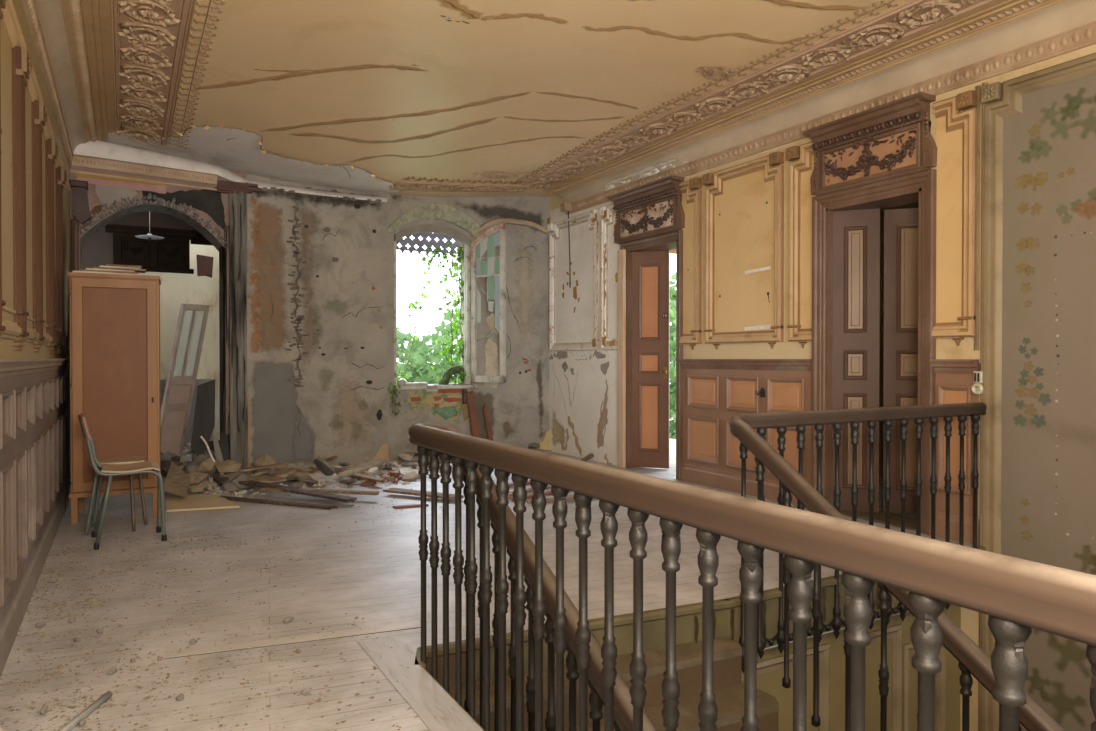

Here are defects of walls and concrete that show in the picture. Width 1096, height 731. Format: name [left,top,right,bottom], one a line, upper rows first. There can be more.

peeling [108,125,402,209]
flaking render [285,206,330,387]
peeling [562,262,580,313]
peeling [592,315,615,347]
peeling [592,210,629,306]